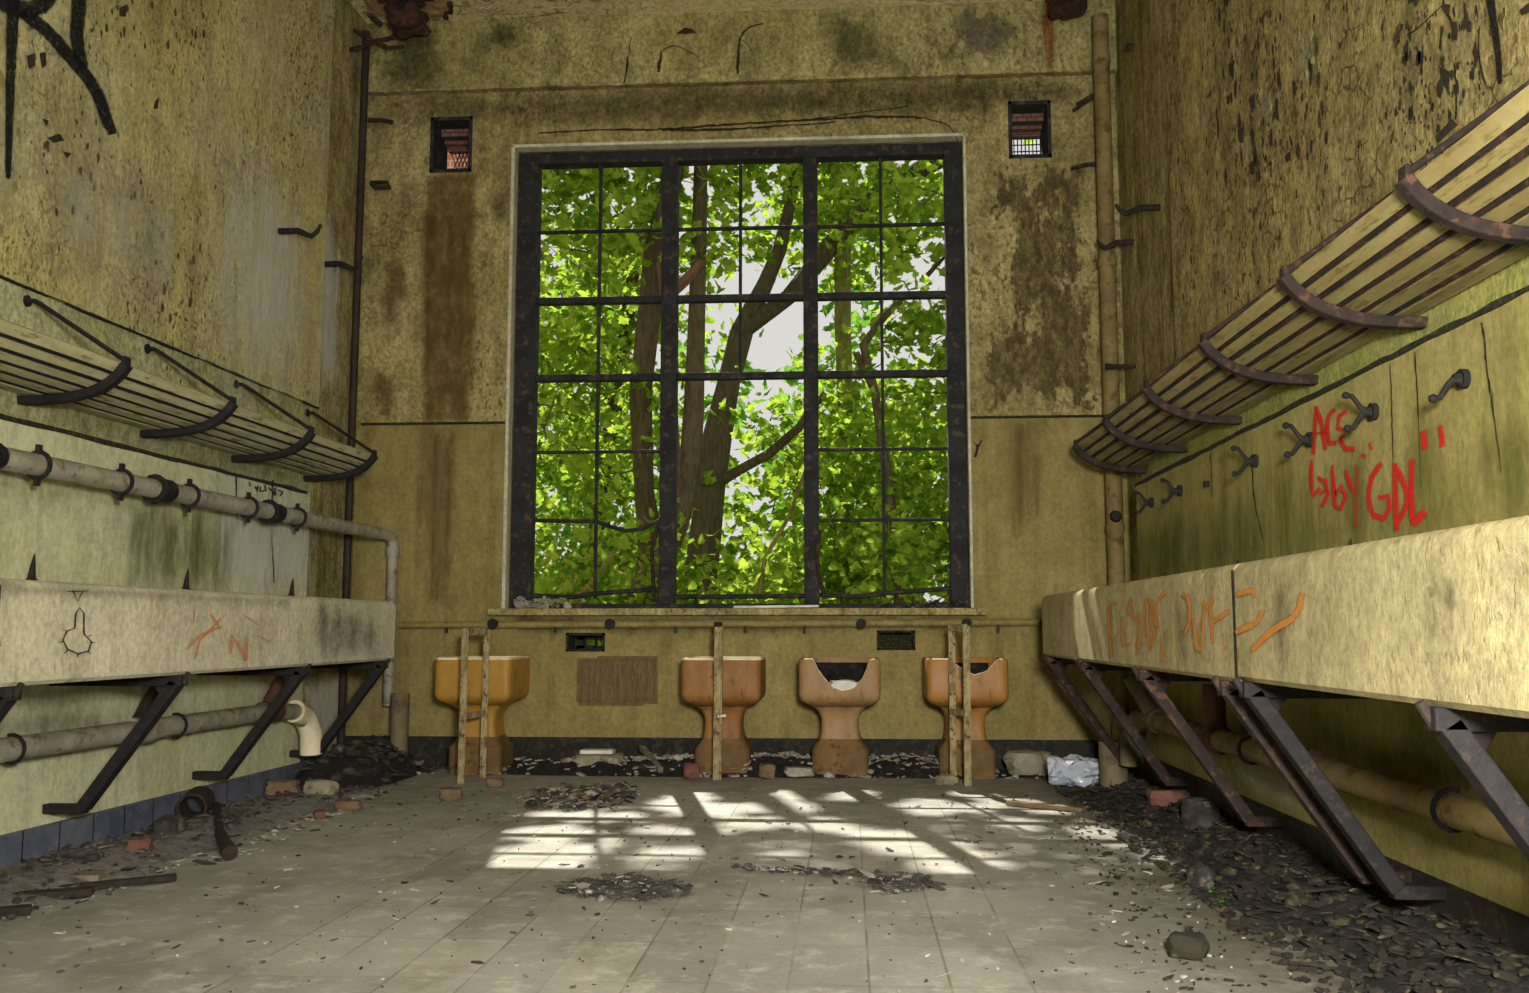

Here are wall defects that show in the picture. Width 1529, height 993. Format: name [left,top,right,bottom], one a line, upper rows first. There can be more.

spalling [349,0,405,52]
spalling [420,0,453,20]
peeling [952,6,1021,69]
water stain [424,175,474,420]